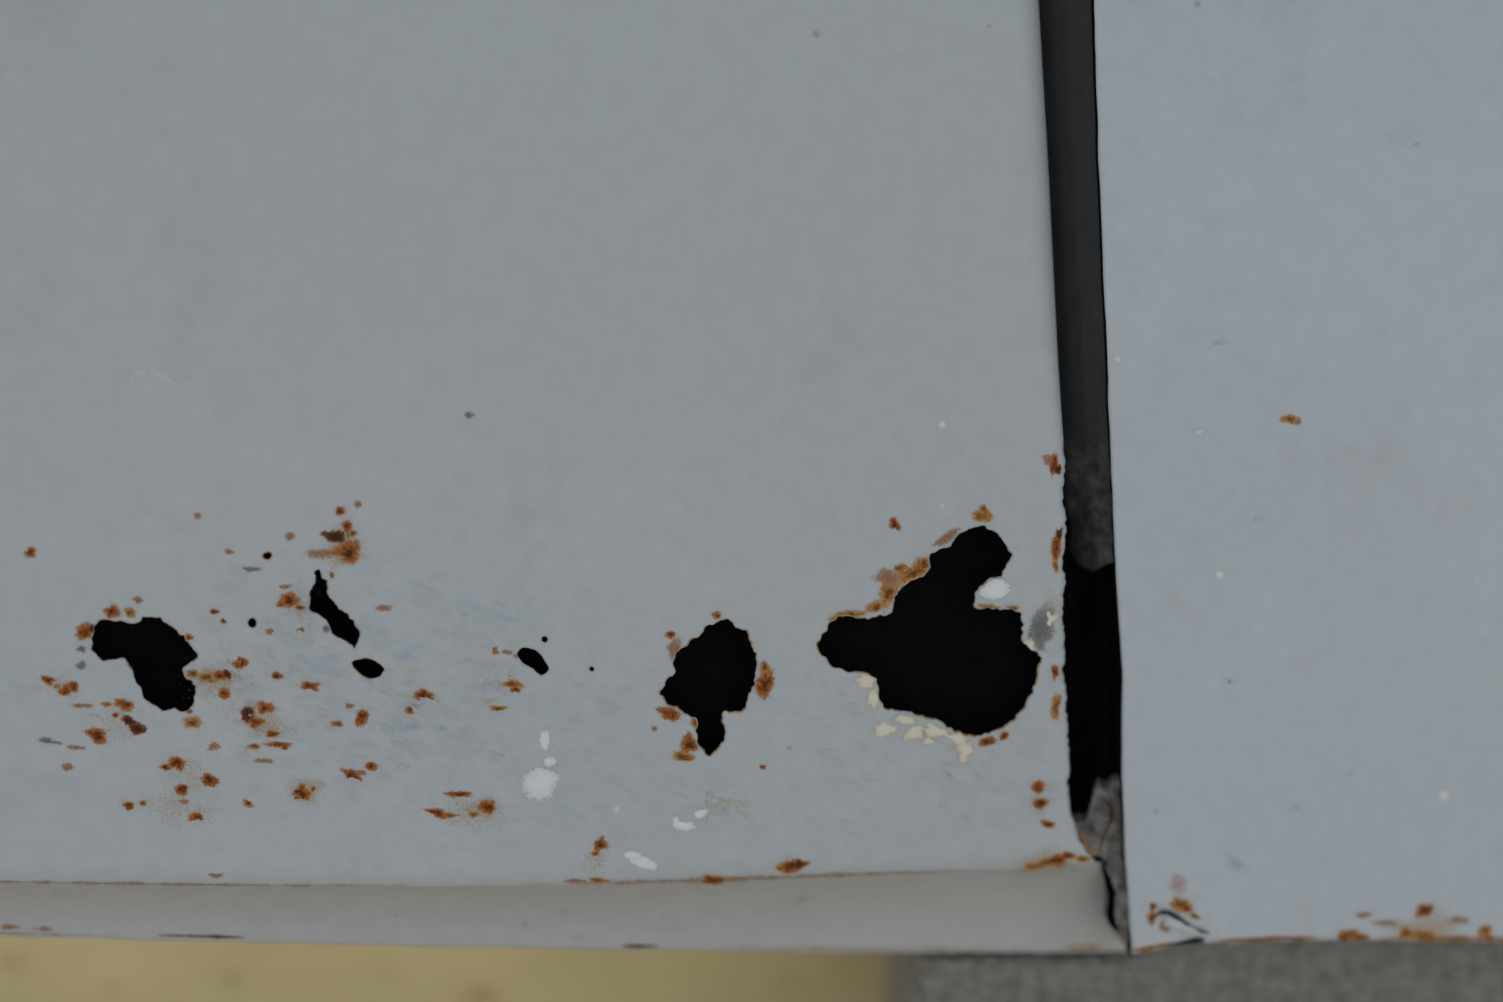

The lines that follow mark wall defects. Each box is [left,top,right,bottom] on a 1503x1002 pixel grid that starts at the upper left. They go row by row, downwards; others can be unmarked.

rust [75,597,143,641]
rust [283,501,373,579]
rust [829,504,995,622]
peeling [976,579,1012,600]
peeling [1024,602,1058,652]
rust [28,663,147,772]
rust [182,608,302,767]
peeling [853,673,975,765]
rust [121,742,254,834]
rust [284,762,378,809]
rust [419,790,517,841]
rust [1335,899,1503,943]